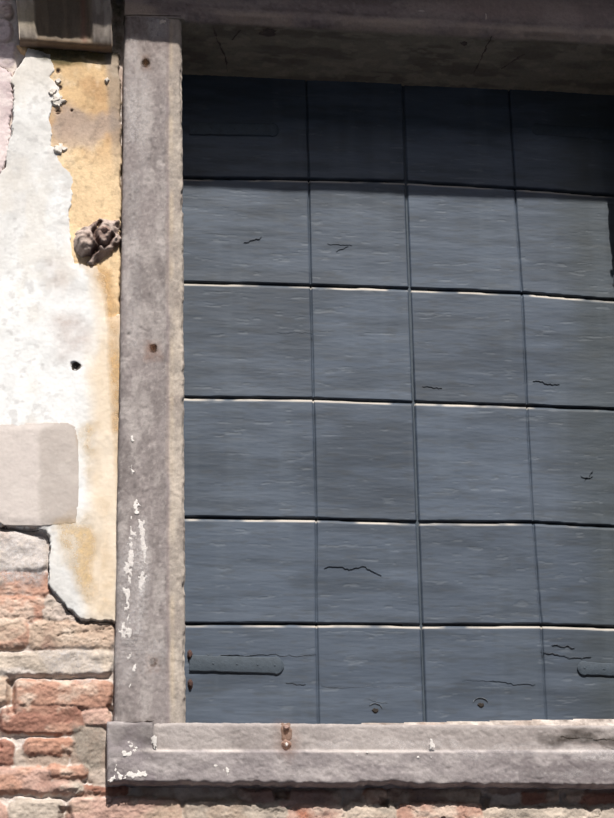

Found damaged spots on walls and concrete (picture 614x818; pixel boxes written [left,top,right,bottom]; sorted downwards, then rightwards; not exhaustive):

flaking render [0,67,14,174]
flaking render [16,45,123,317]
peeling [118,499,148,639]